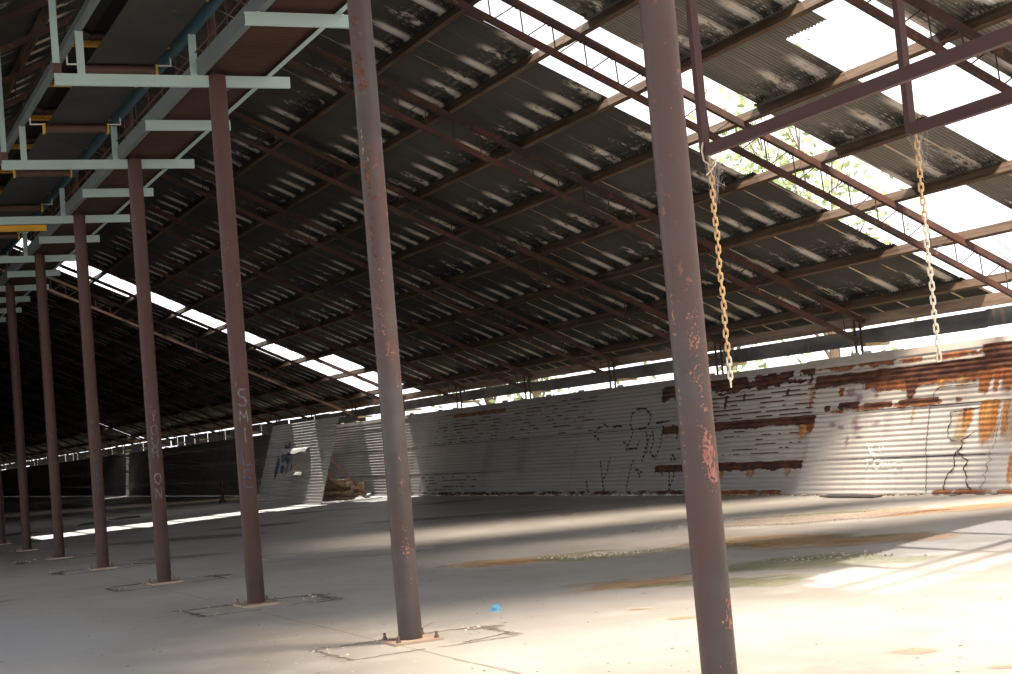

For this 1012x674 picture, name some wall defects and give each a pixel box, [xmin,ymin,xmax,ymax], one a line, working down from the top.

corrosion [661,386,676,403]
corrosion [662,426,679,435]
corrosion [710,341,1012,478]
corrosion [873,454,1012,515]
crack [404,622,523,674]